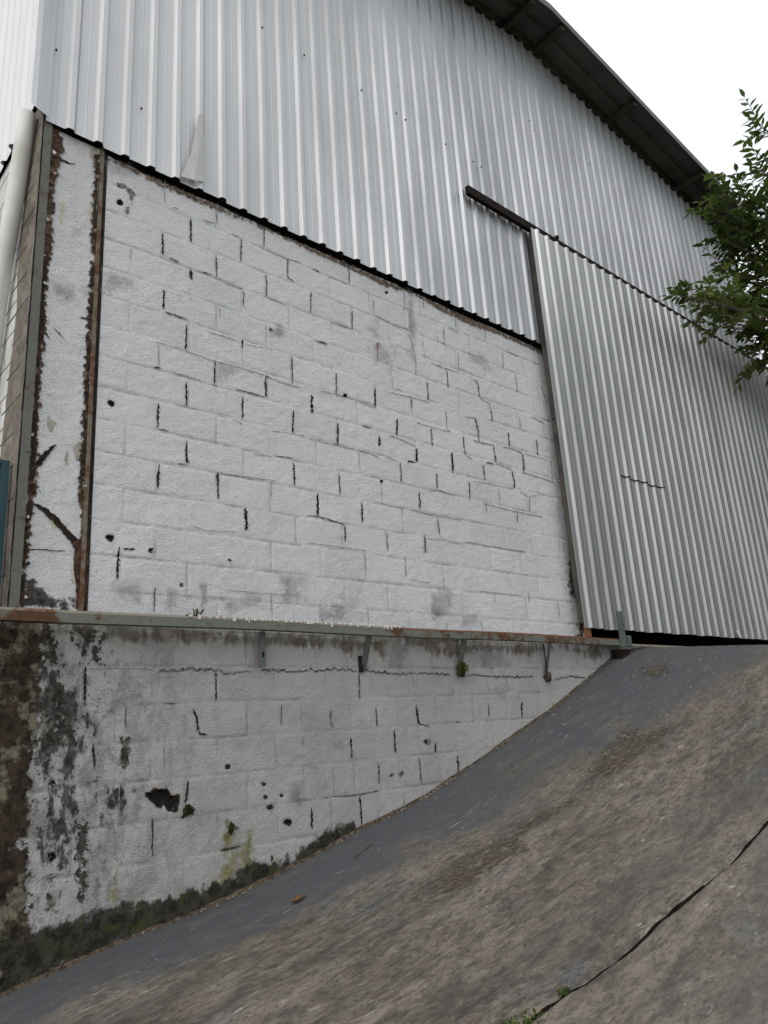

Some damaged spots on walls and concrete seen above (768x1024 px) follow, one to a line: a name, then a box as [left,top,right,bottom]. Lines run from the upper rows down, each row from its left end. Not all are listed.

crack [154,180,554,583]
crack [29,444,89,551]
crack [116,547,135,579]
crack [227,590,321,617]
leakage [0,622,605,985]
crack [125,666,587,830]
crack [528,821,768,1024]